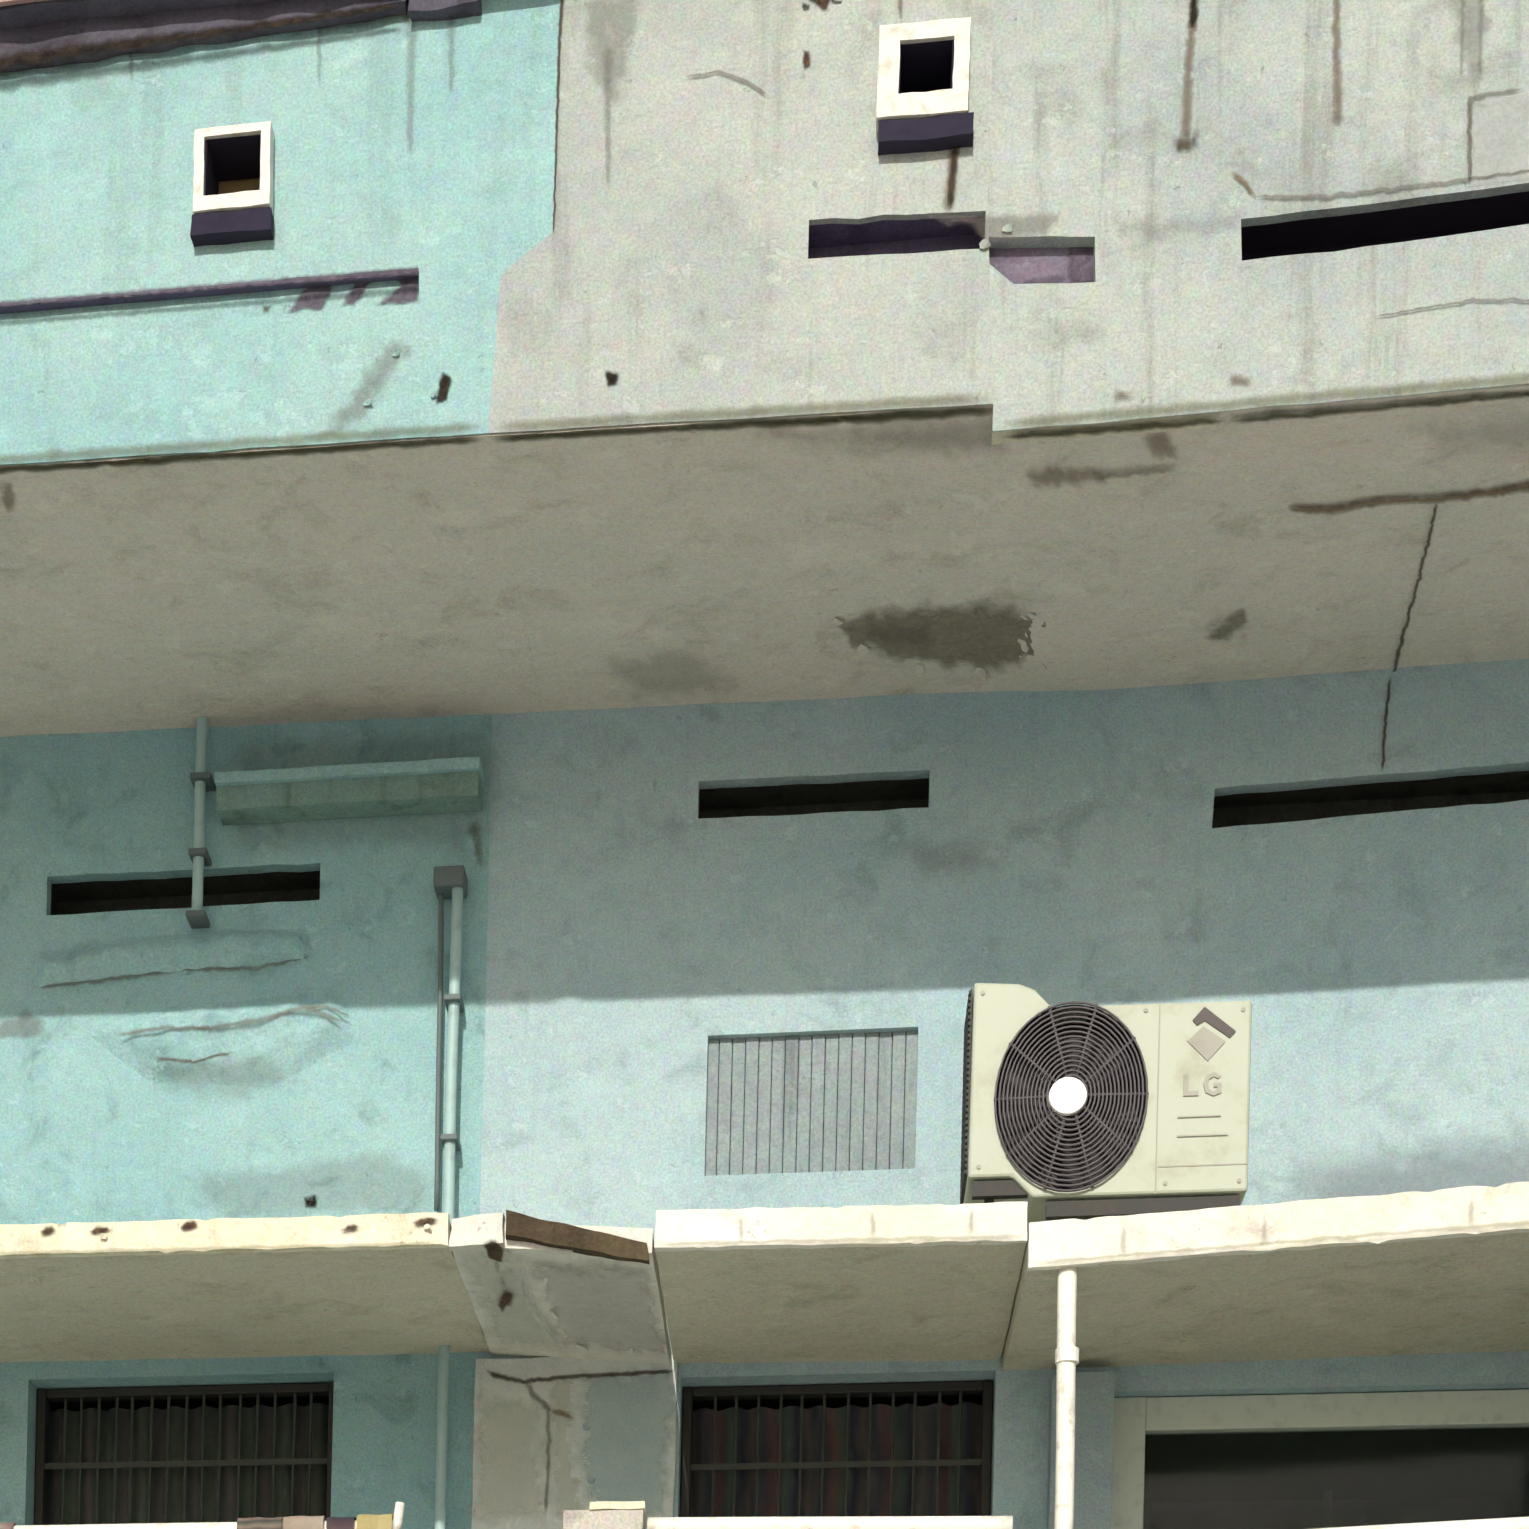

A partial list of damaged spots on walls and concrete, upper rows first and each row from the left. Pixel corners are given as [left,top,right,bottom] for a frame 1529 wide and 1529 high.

crack [1291,483,1529,768]
crack [121,1005,347,1063]
spalling [484,1241,503,1267]
spalling [499,1292,513,1311]
crack [488,1370,670,1508]